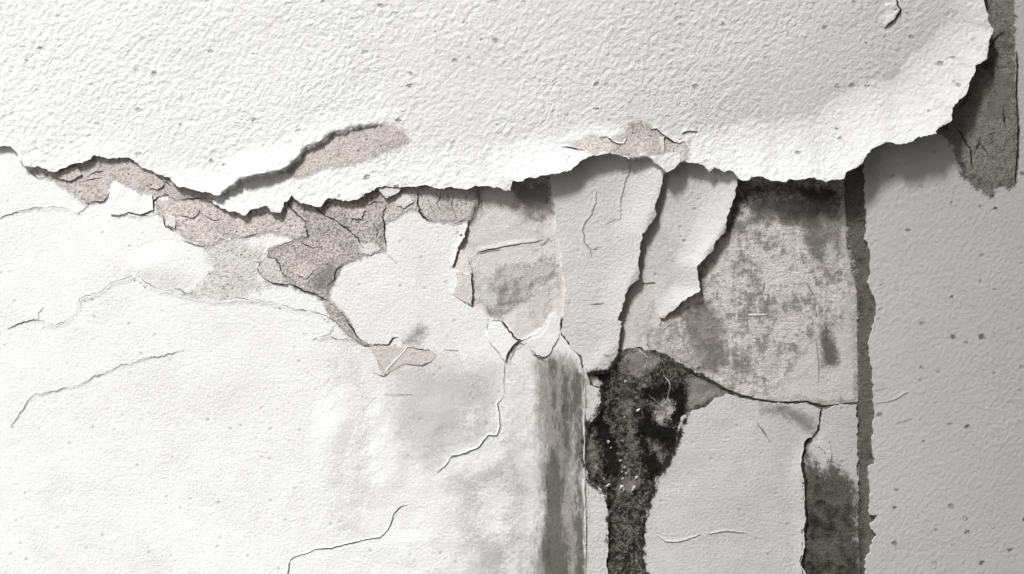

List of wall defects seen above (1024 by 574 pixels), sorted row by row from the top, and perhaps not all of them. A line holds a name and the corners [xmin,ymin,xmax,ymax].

crack [10,351,180,427]
crack [0,200,457,397]
crack [286,505,405,574]
crack [416,188,550,473]
peeling [0,0,1019,423]
peeling [585,465,609,574]
damp [464,347,735,574]
crack [658,528,746,542]
spalling [643,176,863,574]
crack [677,362,911,574]
damp [816,324,839,380]